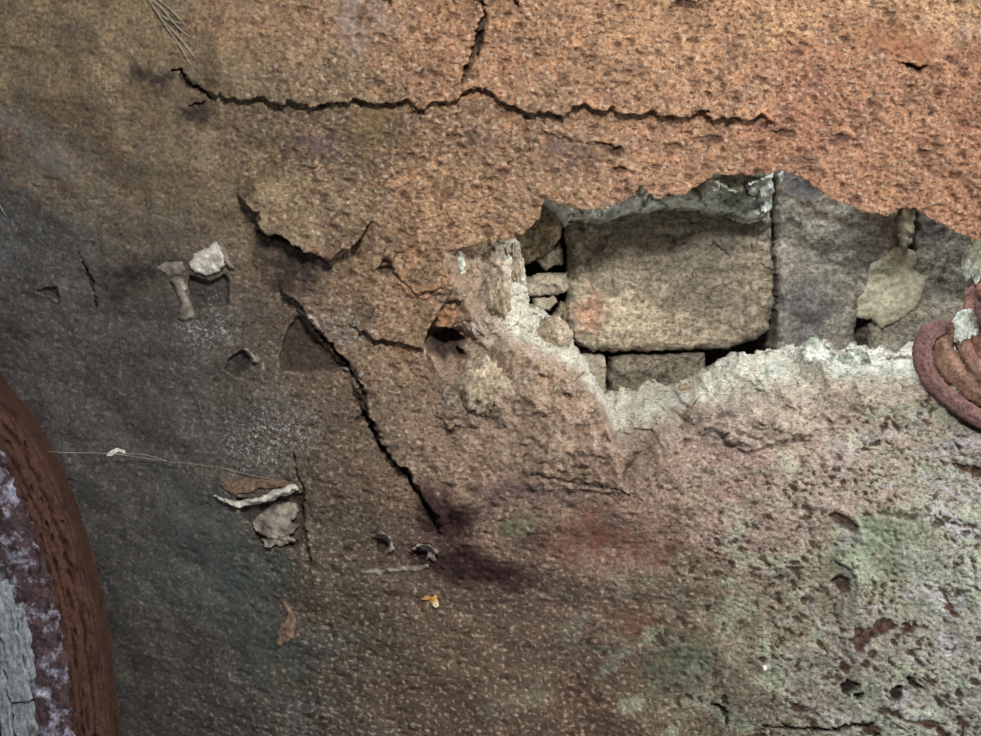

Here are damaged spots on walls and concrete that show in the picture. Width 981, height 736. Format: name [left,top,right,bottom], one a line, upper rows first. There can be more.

crack [461,0,488,83]
crack [172,68,212,106]
crack [251,211,306,254]
spalling [543,171,824,227]
peeling [157,241,235,321]
spalling [225,348,258,376]
spalling [279,305,365,380]
spalling [424,237,930,493]
rust [912,286,981,429]
crack [316,329,441,533]
peeling [214,476,304,548]
crack [762,722,873,733]